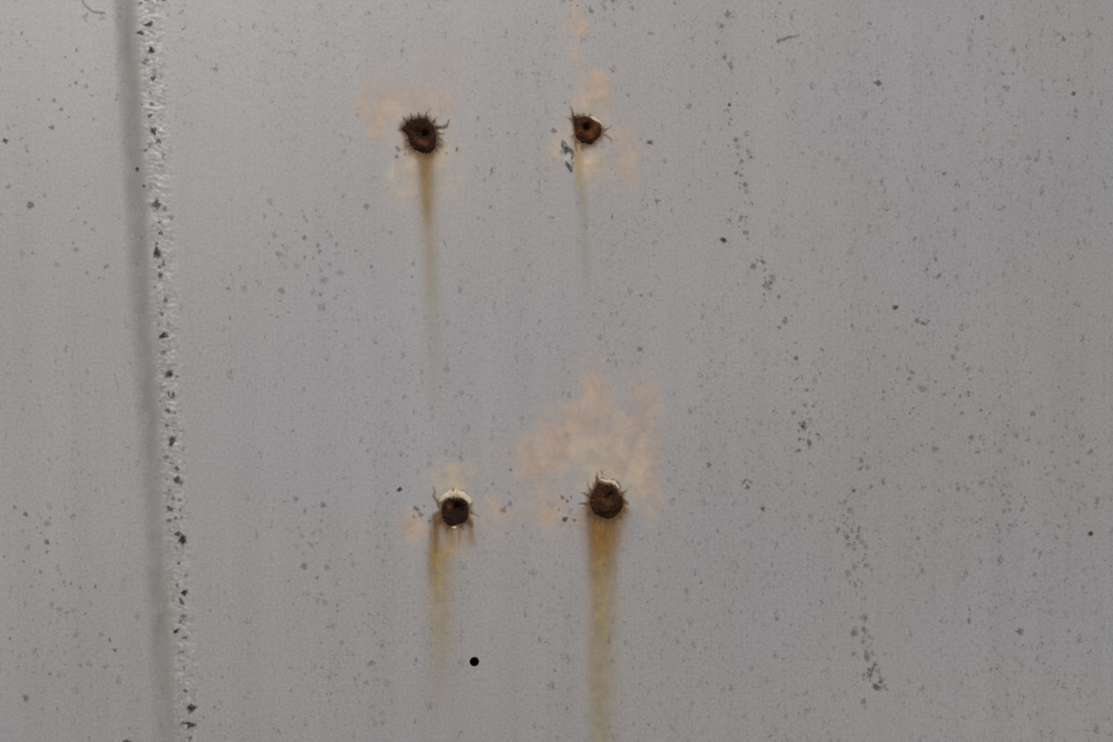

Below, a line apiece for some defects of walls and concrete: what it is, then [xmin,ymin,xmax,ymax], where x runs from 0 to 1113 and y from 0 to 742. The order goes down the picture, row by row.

rust [401,115,448,187]
rust [432,490,472,570]
rust [582,476,626,614]